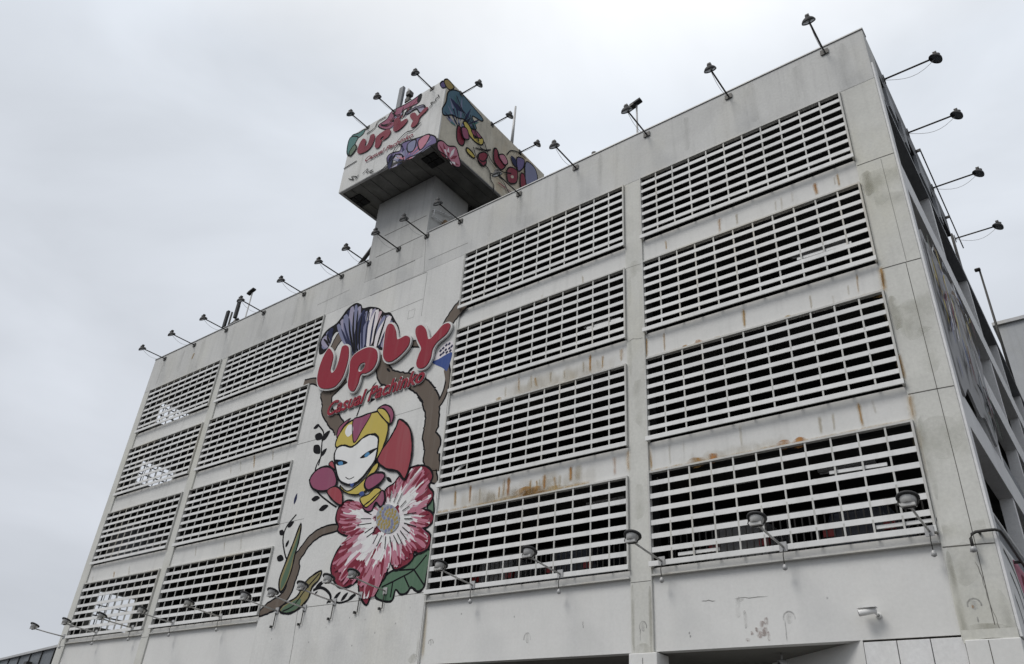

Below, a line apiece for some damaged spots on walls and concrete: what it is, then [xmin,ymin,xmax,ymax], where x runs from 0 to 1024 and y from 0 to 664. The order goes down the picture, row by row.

rust [494,468,585,502]